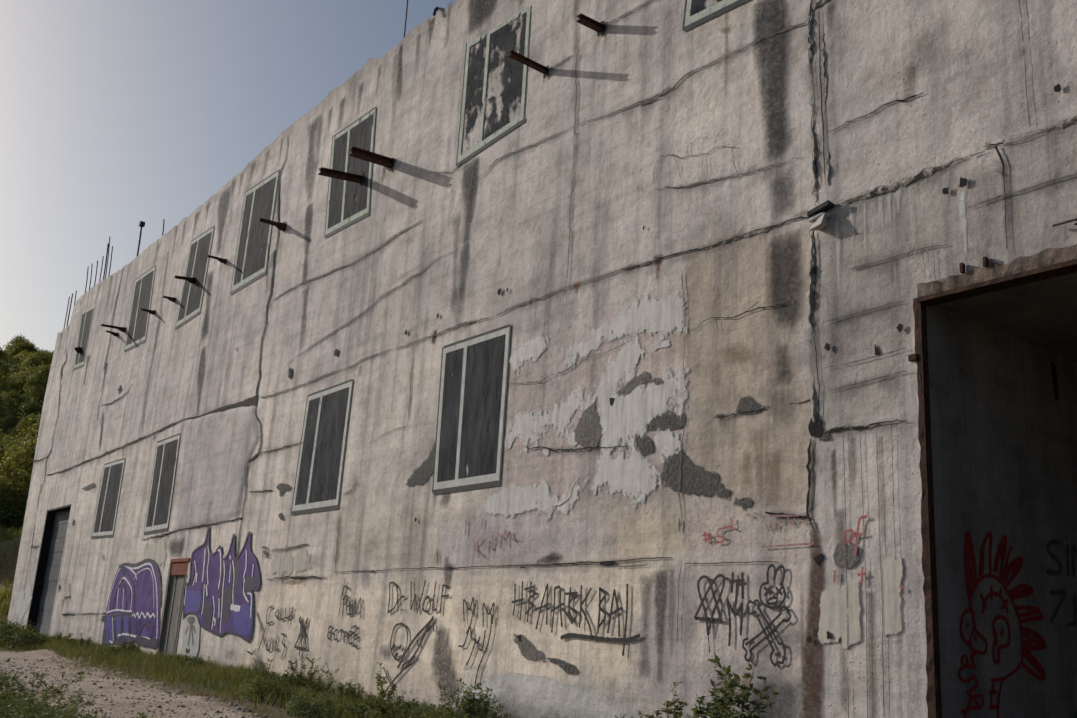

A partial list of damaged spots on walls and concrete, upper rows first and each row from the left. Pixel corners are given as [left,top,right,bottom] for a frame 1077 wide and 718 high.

water stain [469,0,496,28]
water stain [755,0,787,155]
crack [835,0,1077,246]
water stain [464,160,478,231]
crack [29,0,924,560]
water stain [770,239,799,324]
crack [850,243,947,283]
peeling [484,291,753,521]
spalling [736,396,762,414]
crack [267,526,779,641]
crack [844,618,852,718]
crack [865,523,885,717]